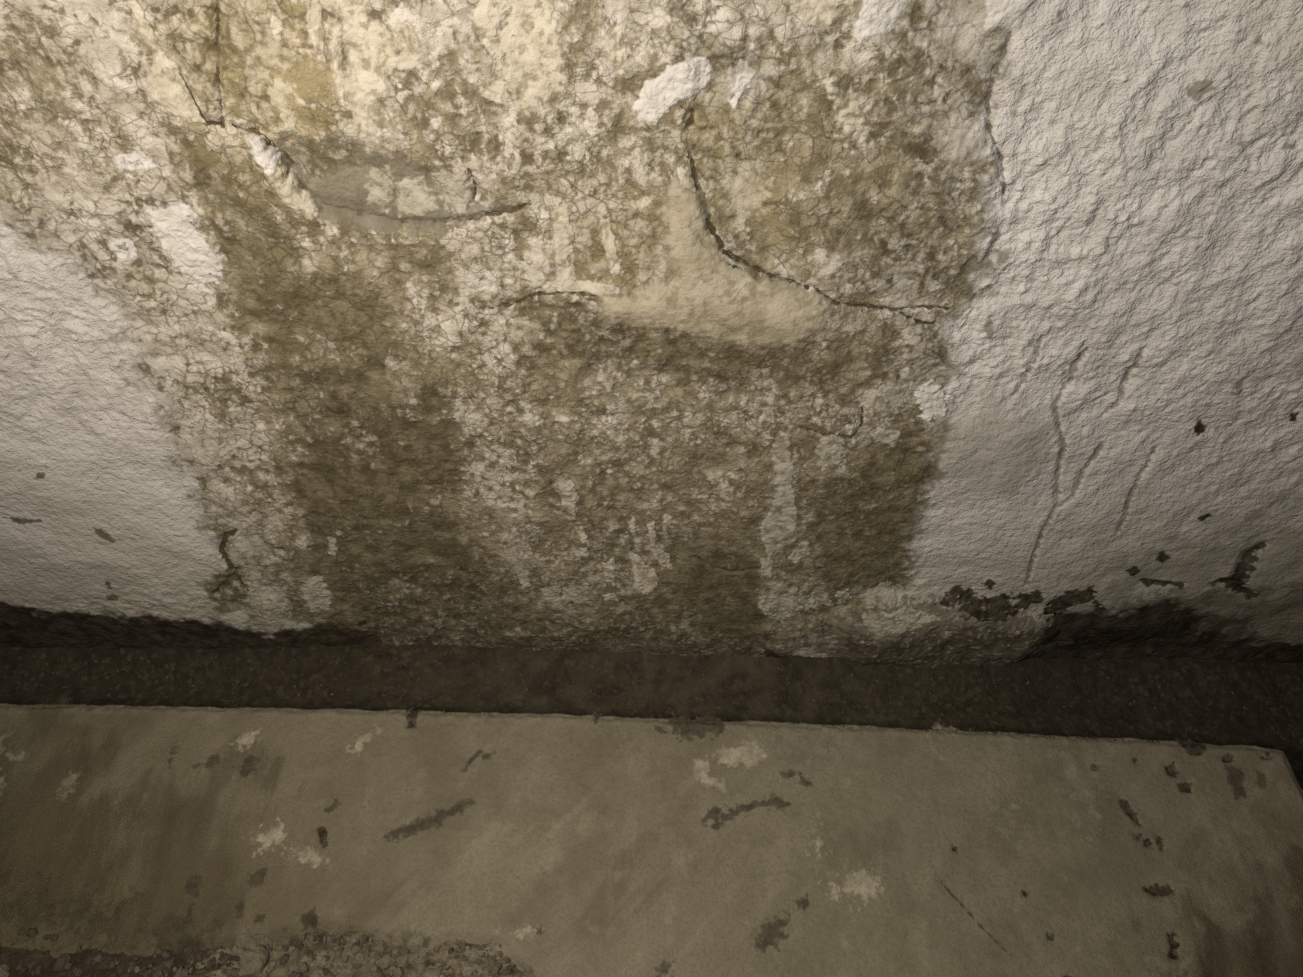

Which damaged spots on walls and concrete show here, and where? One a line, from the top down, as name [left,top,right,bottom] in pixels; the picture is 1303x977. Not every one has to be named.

crack [179,0,323,209]
spalling [1187,80,1213,100]
crack [400,168,531,224]
crack [684,109,950,324]
spalling [991,233,1011,262]
leakage [0,0,1303,668]
spalling [1194,420,1206,436]